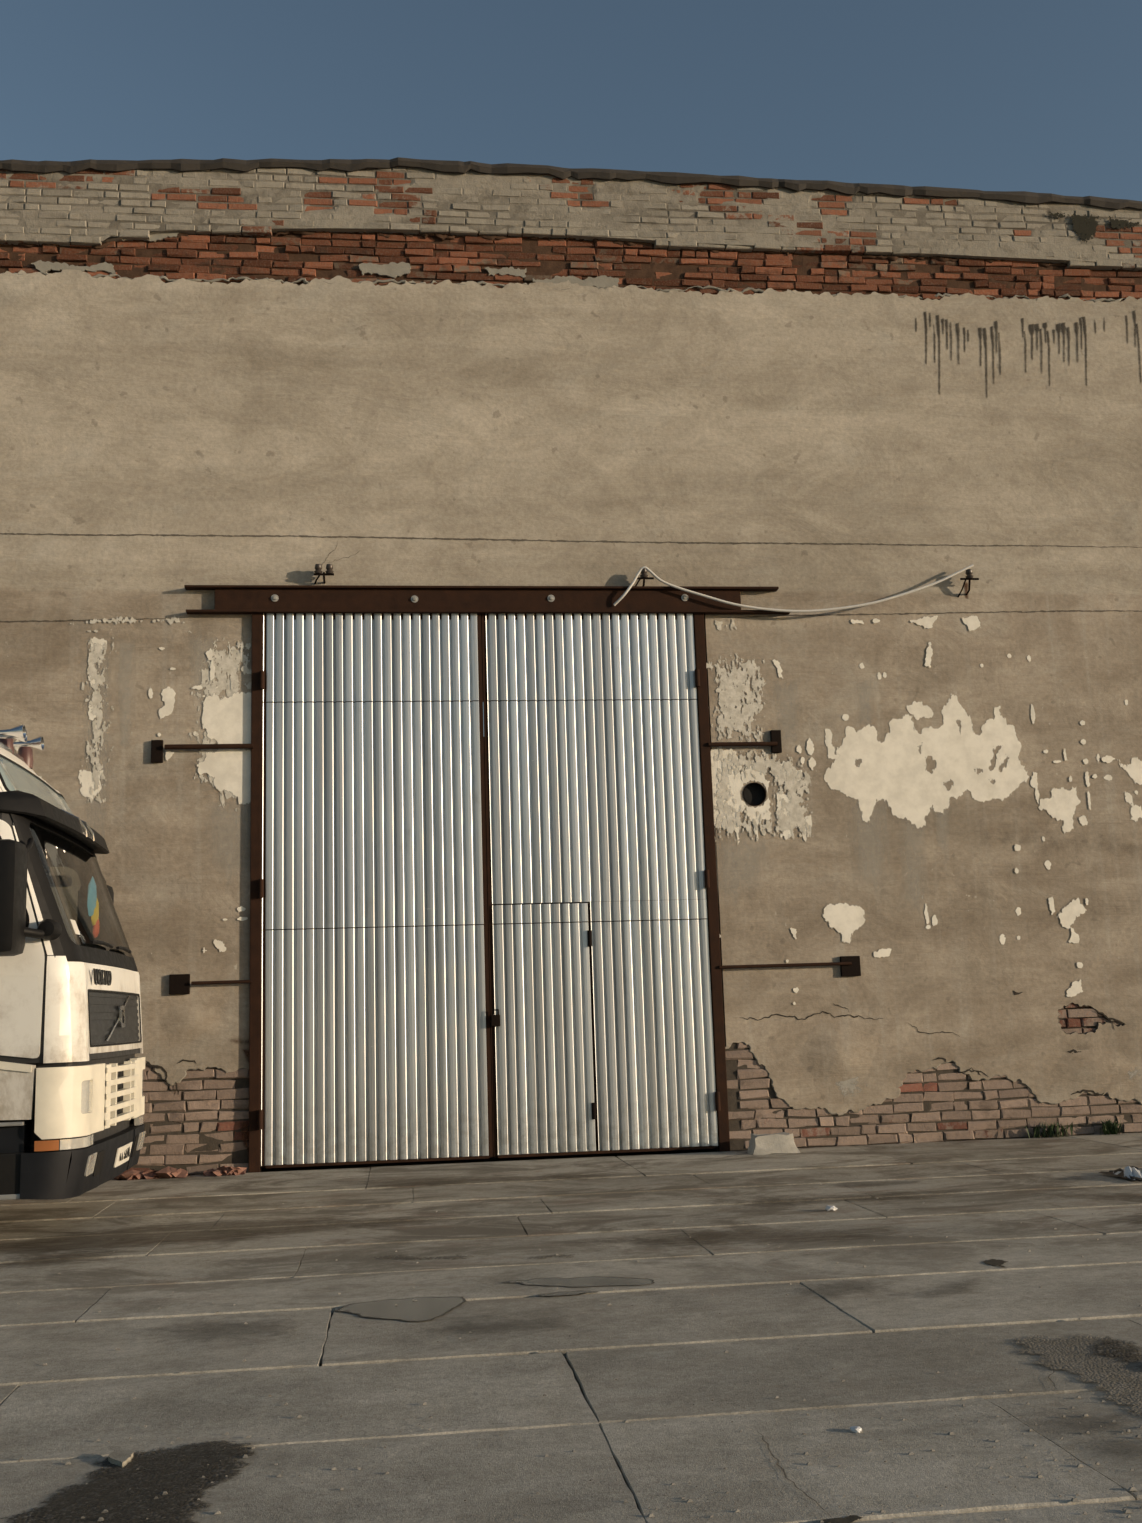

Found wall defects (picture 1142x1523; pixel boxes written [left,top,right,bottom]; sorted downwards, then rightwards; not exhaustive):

spalling [0,225,1142,302]
leakage [915,312,1001,395]
leakage [1021,317,1105,385]
leakage [1125,311,1142,382]
peeling [70,615,192,804]
peeling [148,638,251,811]
peeling [703,653,1142,845]
peeling [823,903,865,944]
peeling [1048,897,1088,943]
spalling [123,1042,262,1175]
spalling [717,1012,1142,1152]
crack [757,1431,831,1517]